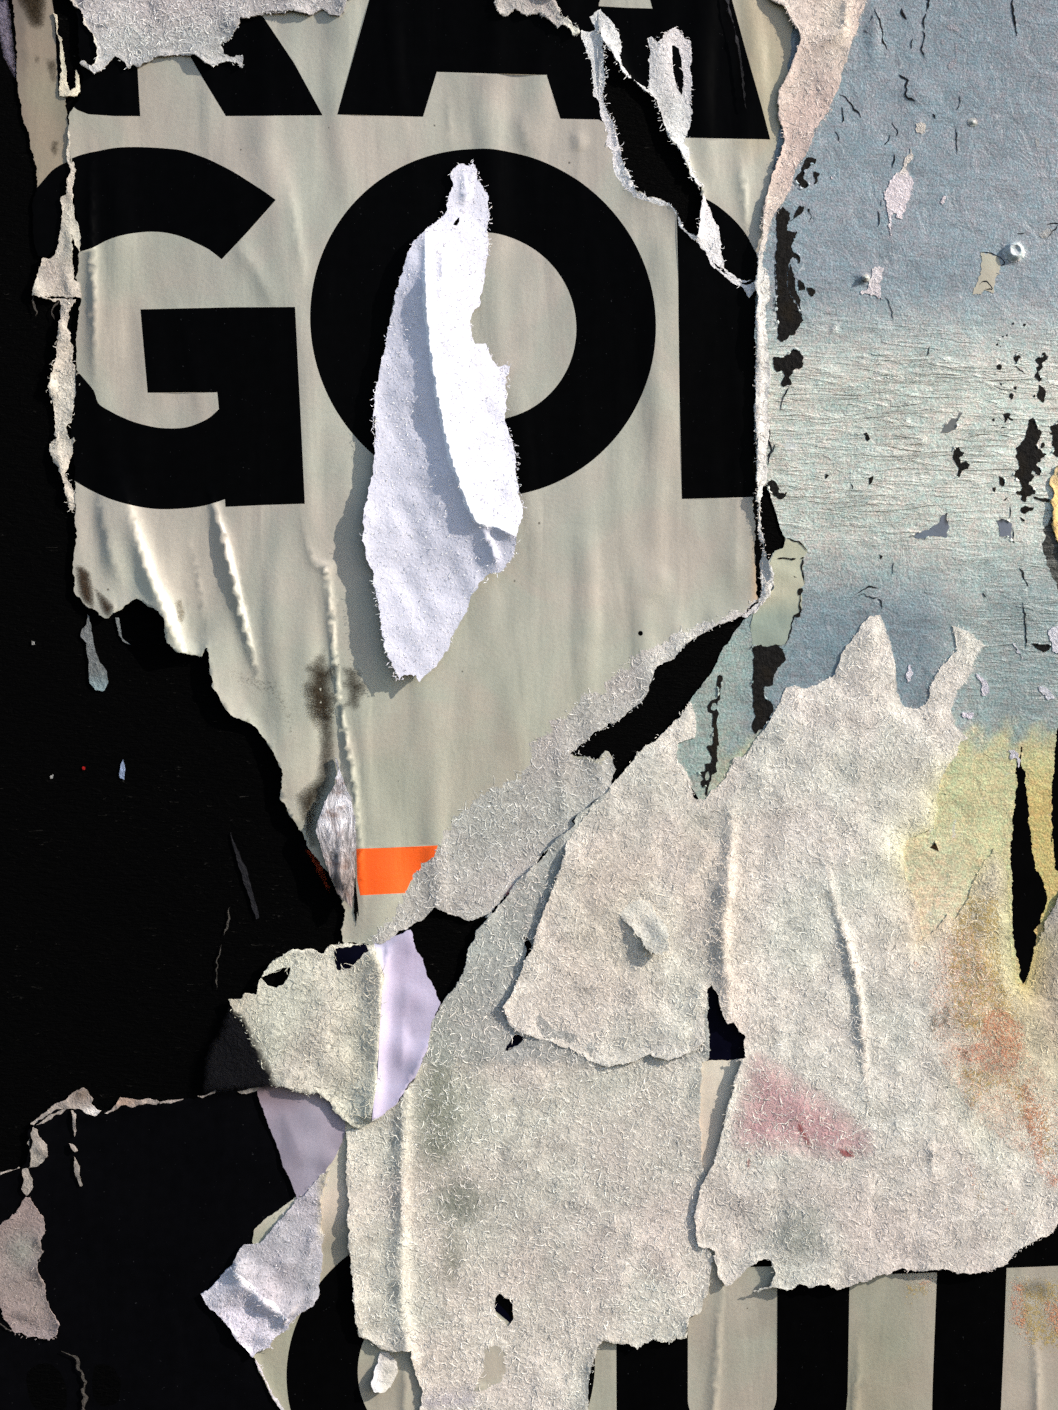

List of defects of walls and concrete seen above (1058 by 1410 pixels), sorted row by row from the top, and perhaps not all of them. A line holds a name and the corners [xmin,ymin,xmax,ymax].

peeling [794,157,820,189]
peeling [773,205,815,387]
peeling [992,322,1058,542]
spalling [750,538,807,734]
peeling [698,675,723,796]